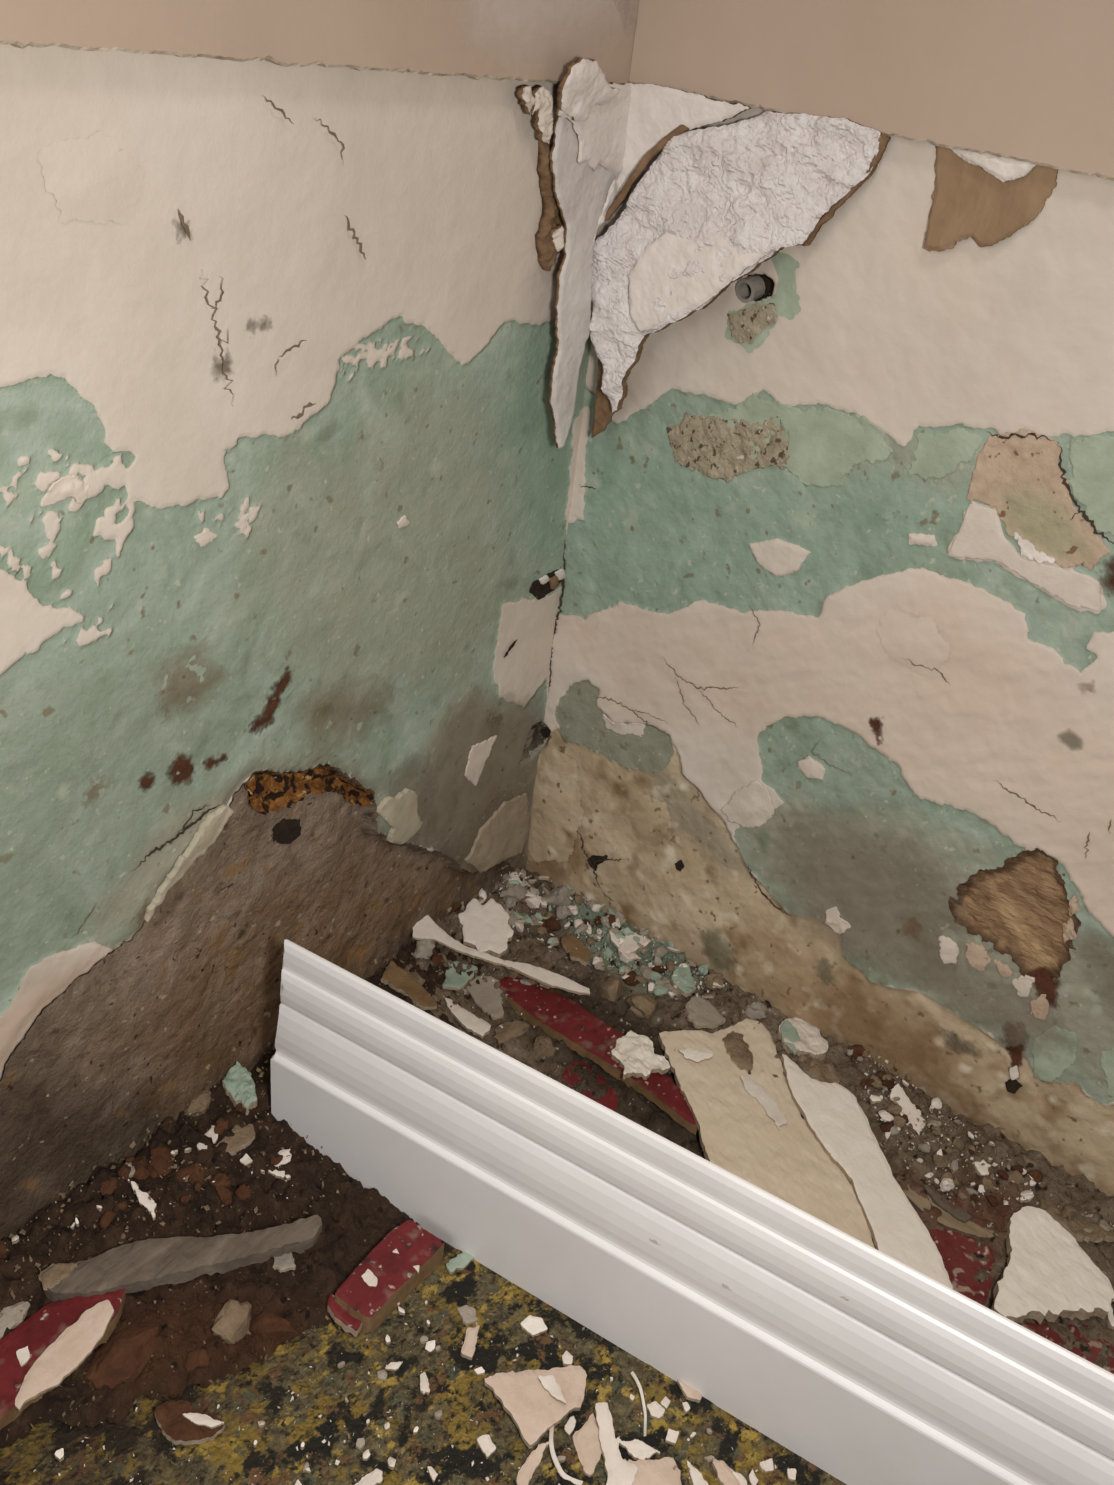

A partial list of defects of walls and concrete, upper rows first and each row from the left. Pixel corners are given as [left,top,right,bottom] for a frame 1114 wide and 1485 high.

peeling [0,57,1114,1240]
corrosion [251,667,290,732]
crack [591,657,743,741]
corrosion [140,754,227,789]
spalling [273,1252,296,1273]
spalling [446,1252,474,1274]
peeling [16,1346,30,1367]